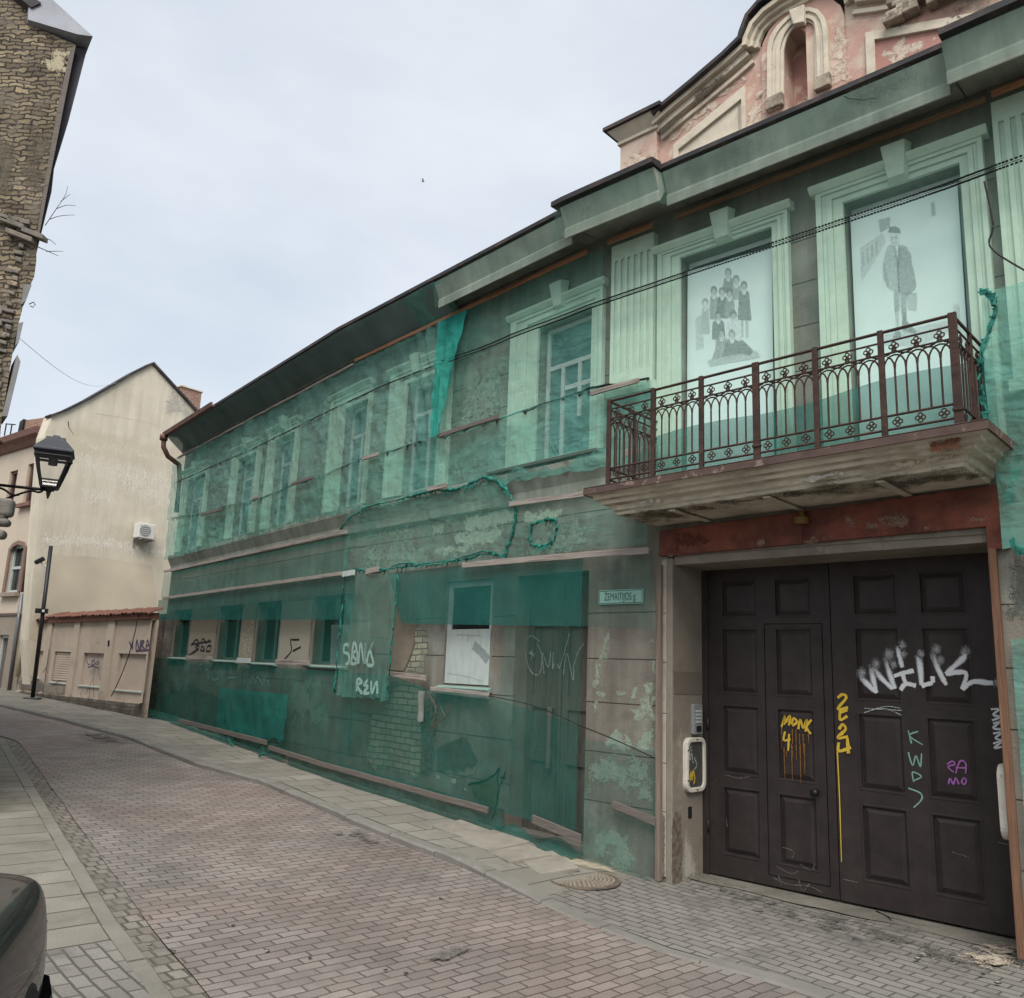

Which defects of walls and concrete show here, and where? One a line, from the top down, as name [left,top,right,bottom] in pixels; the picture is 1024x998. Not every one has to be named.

peeling [830,24,852,85]
peeling [406,508,593,565]
peeling [592,630,656,722]